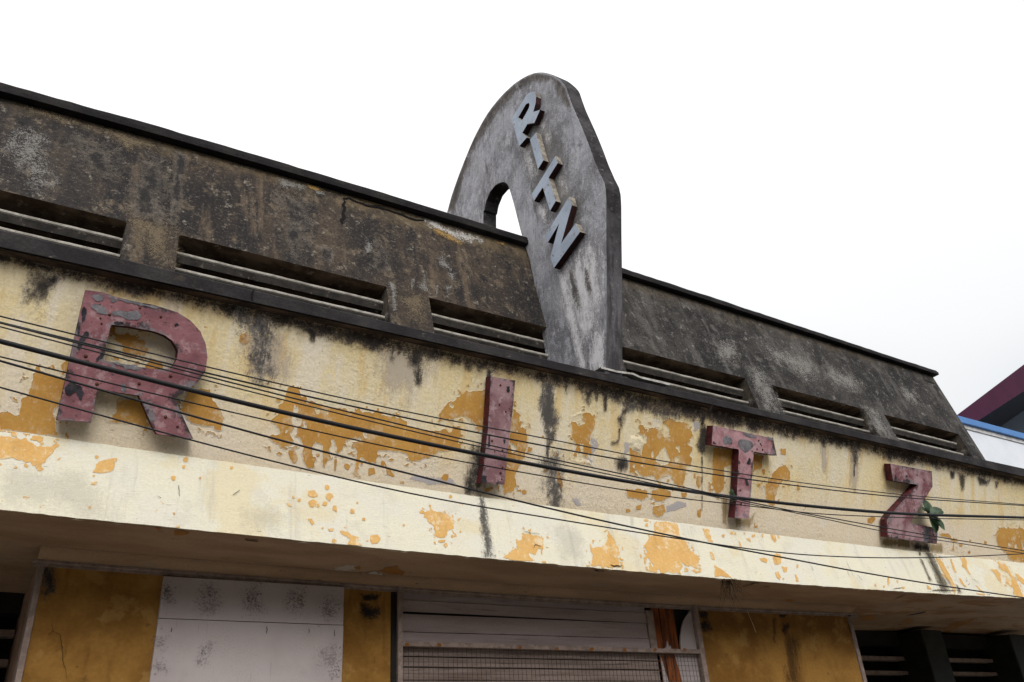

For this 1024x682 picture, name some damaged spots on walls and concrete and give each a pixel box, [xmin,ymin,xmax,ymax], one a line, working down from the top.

leakage [448,74,570,214]
crack [340,197,424,224]
leakage [0,106,1024,507]
peeling [0,361,84,471]
peeling [264,382,490,547]
leakage [410,446,496,557]
peeling [499,527,549,563]
peeling [586,530,624,569]
peeling [626,416,800,582]
leakage [883,539,961,593]
peeling [924,522,1024,597]